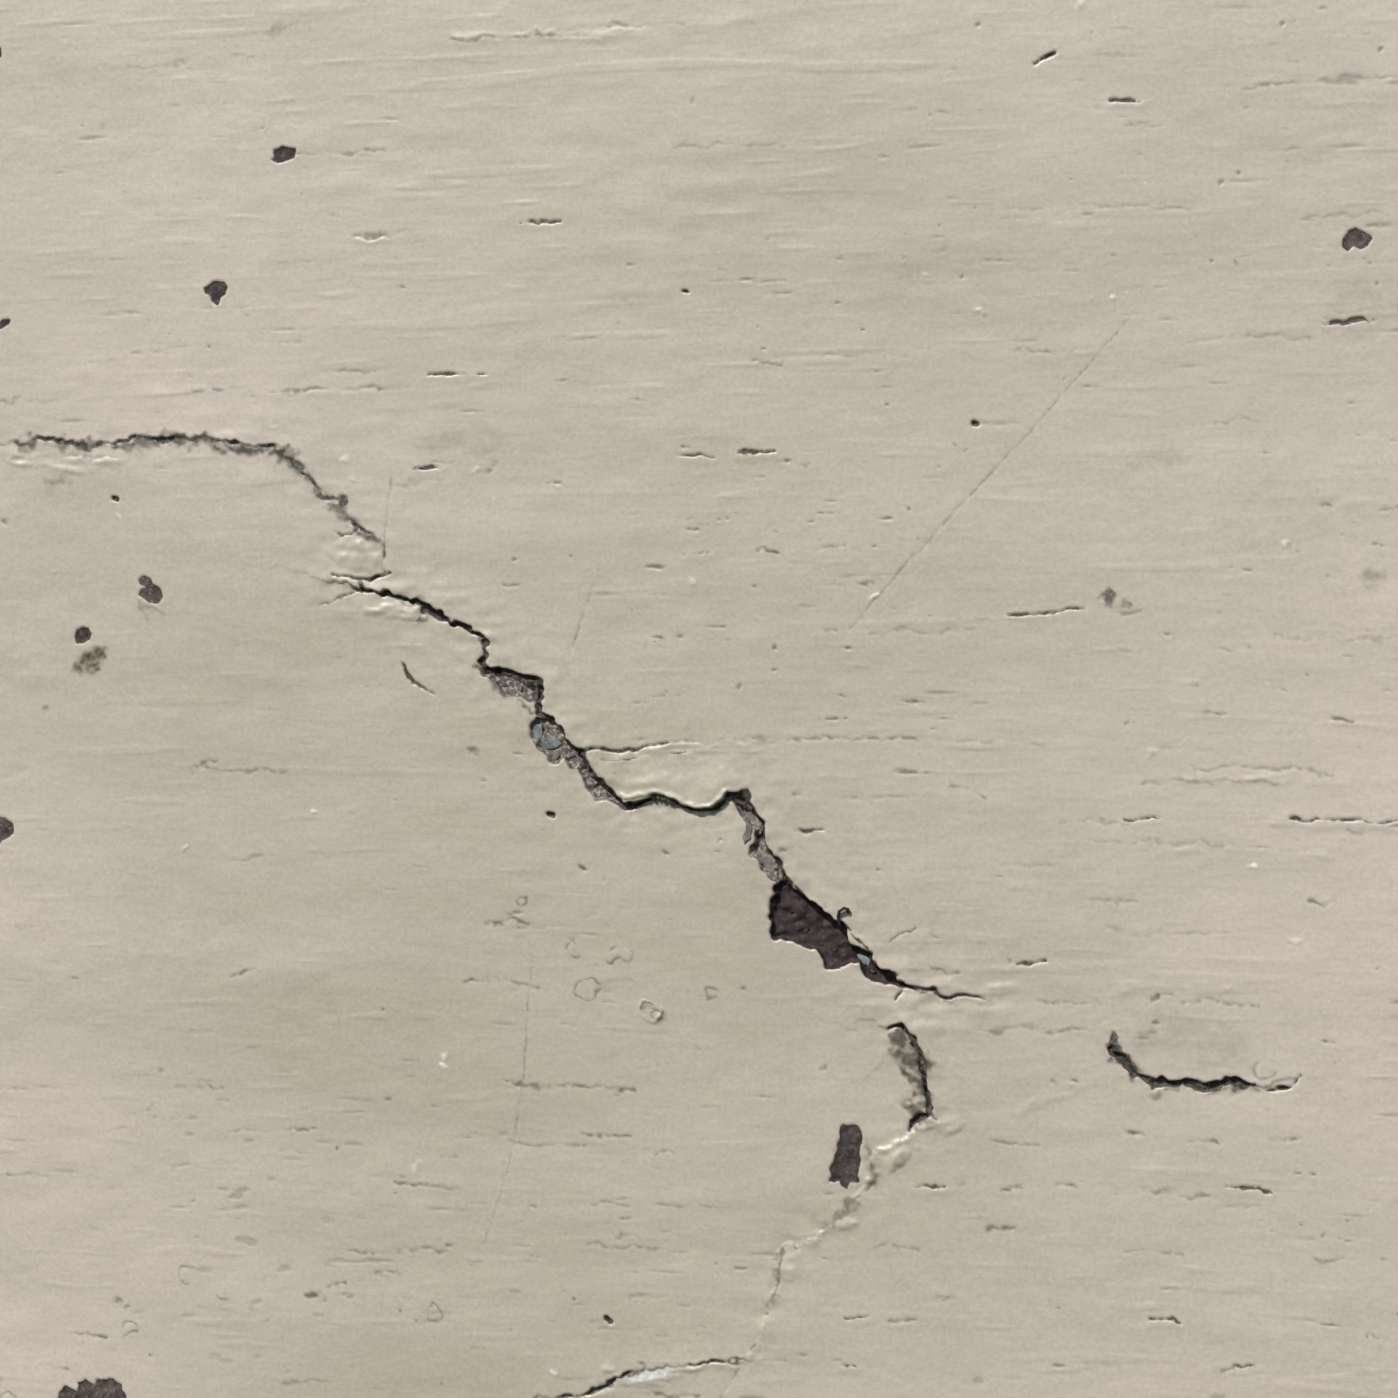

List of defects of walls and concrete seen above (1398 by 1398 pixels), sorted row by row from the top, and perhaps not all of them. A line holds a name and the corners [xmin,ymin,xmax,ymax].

peeling [1342,228,1372,251]
peeling [204,281,227,305]
peeling [139,576,163,604]
crack [15,433,980,1132]
peeling [0,817,14,843]
crack [1108,1032,1301,1093]
peeling [827,1124,862,1188]
peeling [58,1378,126,1398]